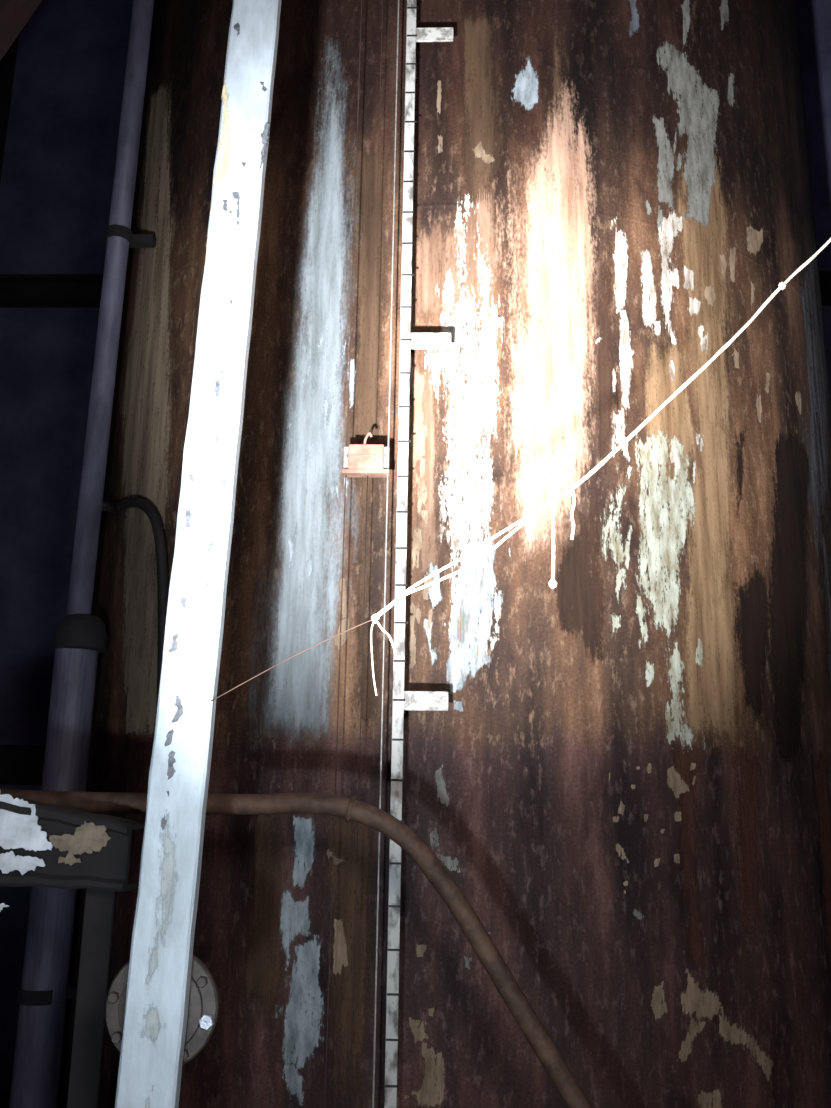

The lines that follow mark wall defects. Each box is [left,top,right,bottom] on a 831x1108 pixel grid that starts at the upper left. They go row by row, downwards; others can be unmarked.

peeling [513,60,539,110]
peeling [408,194,505,712]
rust [409,14,598,576]
peeling [600,0,735,750]
rust [638,156,767,968]
peeling [719,226,763,283]
peeling [756,372,771,423]
peeling [0,794,145,1108]
peeling [275,816,348,1106]
peeling [612,801,625,823]
peeling [667,763,696,798]